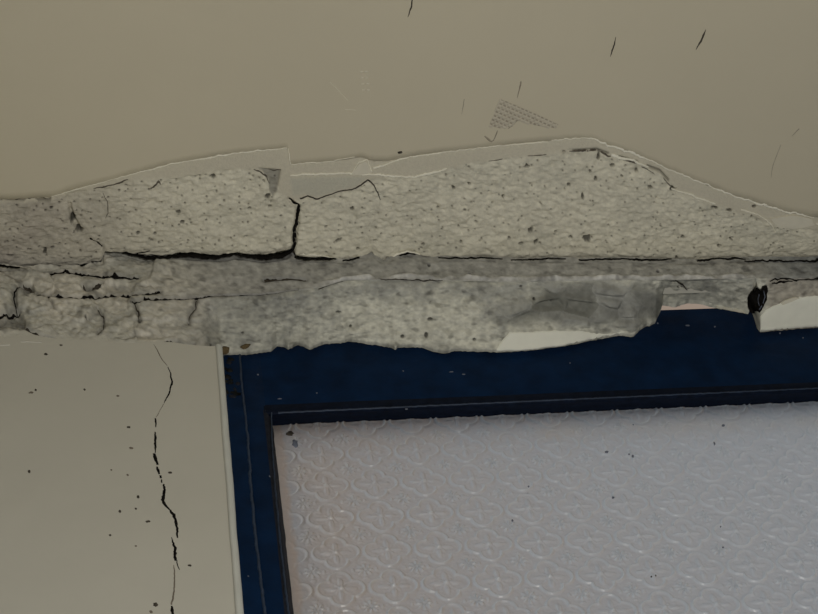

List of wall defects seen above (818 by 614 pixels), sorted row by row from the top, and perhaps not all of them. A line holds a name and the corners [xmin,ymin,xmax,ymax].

crack [0,179,381,337]
spalling [0,130,818,398]
crack [381,276,443,284]
crack [438,255,672,263]
crack [153,341,180,614]